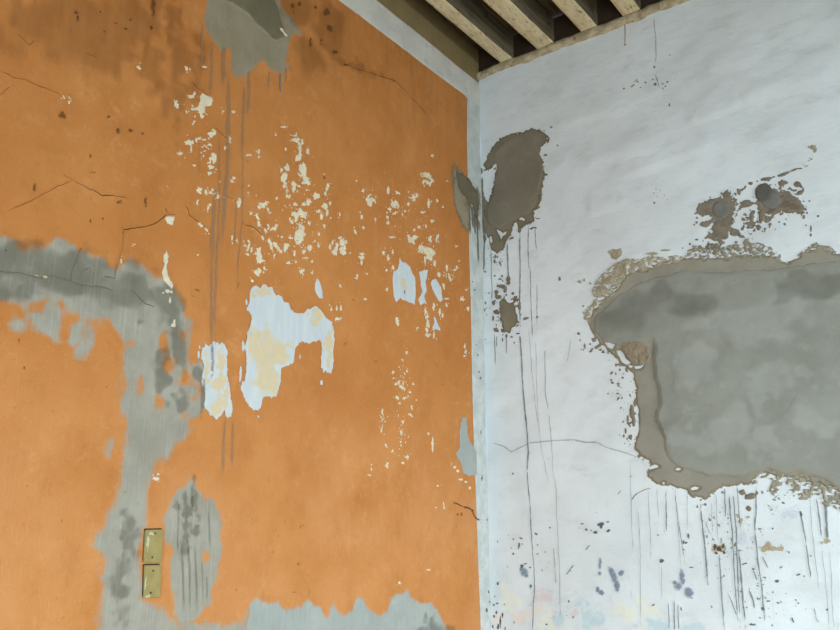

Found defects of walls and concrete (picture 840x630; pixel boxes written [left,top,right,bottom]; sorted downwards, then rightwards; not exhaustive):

peeling [173,91,236,125]
crack [345,63,427,114]
crack [8,174,129,211]
crack [0,206,207,290]
peeling [176,126,365,419]
peeling [353,180,377,235]
peeling [375,187,460,340]
spalling [577,145,836,324]
peeling [385,345,417,468]
peeling [607,368,638,447]
peeling [739,471,840,511]
peeling [247,581,450,630]